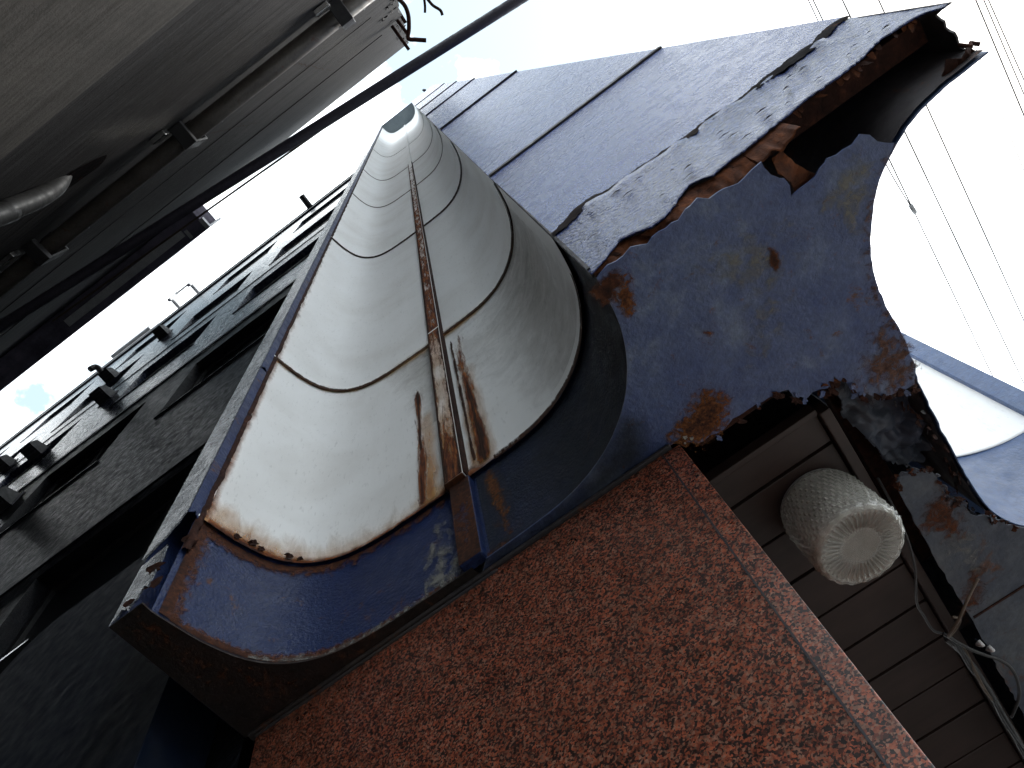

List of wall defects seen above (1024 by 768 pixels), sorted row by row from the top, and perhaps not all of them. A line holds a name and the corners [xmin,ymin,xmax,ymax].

corrosion [892,19,918,38]
corrosion [836,44,882,86]
corrosion [772,186,922,405]
corrosion [159,105,804,662]
corrosion [892,466,968,539]
corrosion [985,511,1019,532]
peeling [425,526,458,596]